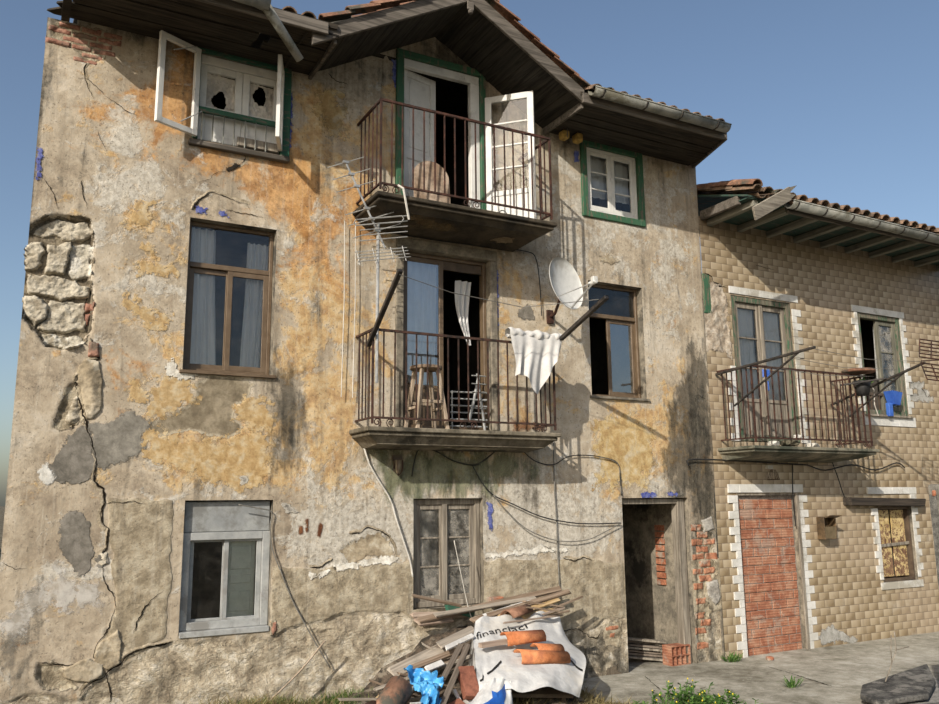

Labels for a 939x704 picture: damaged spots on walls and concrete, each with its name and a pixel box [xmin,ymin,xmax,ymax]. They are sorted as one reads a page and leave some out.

flaking render [45,22,122,65]
crack [83,63,134,114]
crack [190,155,260,217]
flaking render [21,214,99,357]
crack [38,338,173,700]
flaking render [308,532,398,580]
flaking render [484,544,568,559]
flaking render [691,516,720,651]